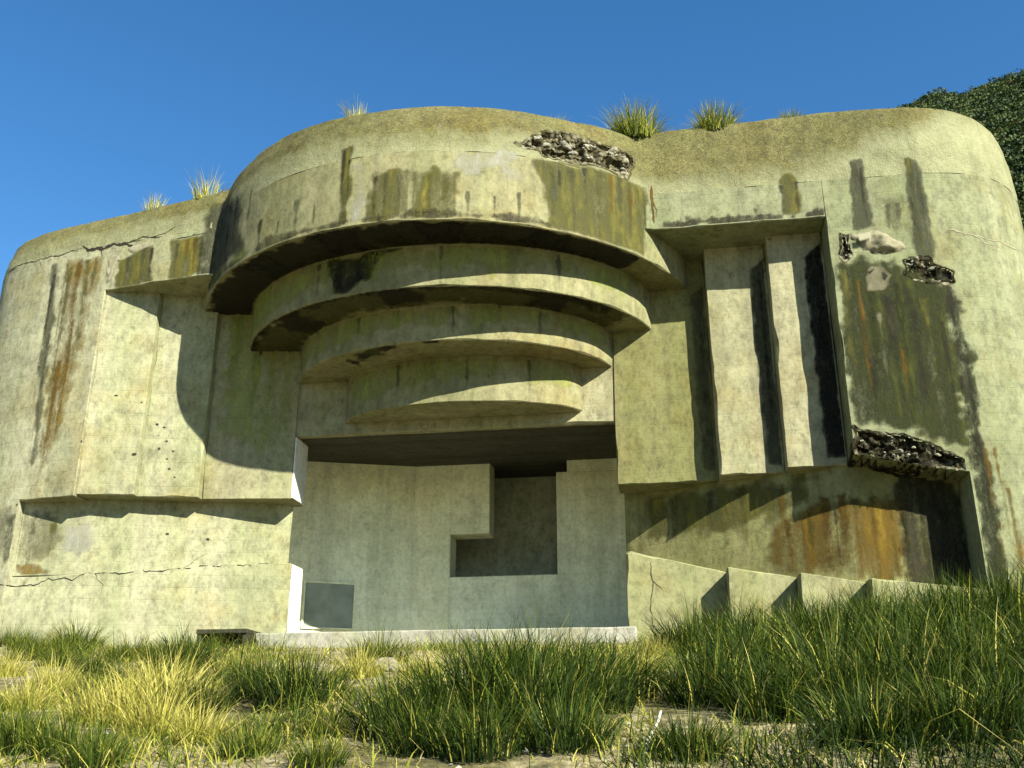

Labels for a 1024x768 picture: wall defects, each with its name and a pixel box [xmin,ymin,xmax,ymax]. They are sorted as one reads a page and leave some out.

spalling [514,130,636,181]
damp [850,159,872,229]
damp [886,158,935,259]
crack [11,227,204,270]
damp [170,147,648,381]
spalling [839,233,853,263]
spalling [903,255,956,285]
damp [31,264,56,464]
corrosion [43,259,100,449]
spalling [847,425,966,480]
corrosion [770,494,909,580]
crack [0,555,273,594]